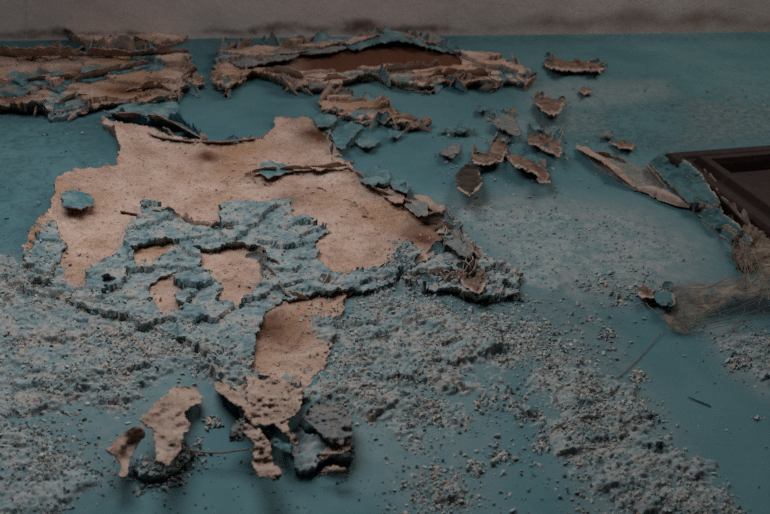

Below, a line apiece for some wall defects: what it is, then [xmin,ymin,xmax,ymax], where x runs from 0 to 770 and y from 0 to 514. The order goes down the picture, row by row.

peeling [541,51,608,75]
peeling [354,136,380,148]
peeling [434,120,475,164]
peeling [448,91,566,197]
peeling [576,128,757,254]
peeling [318,465,352,477]
peeling [389,450,491,514]